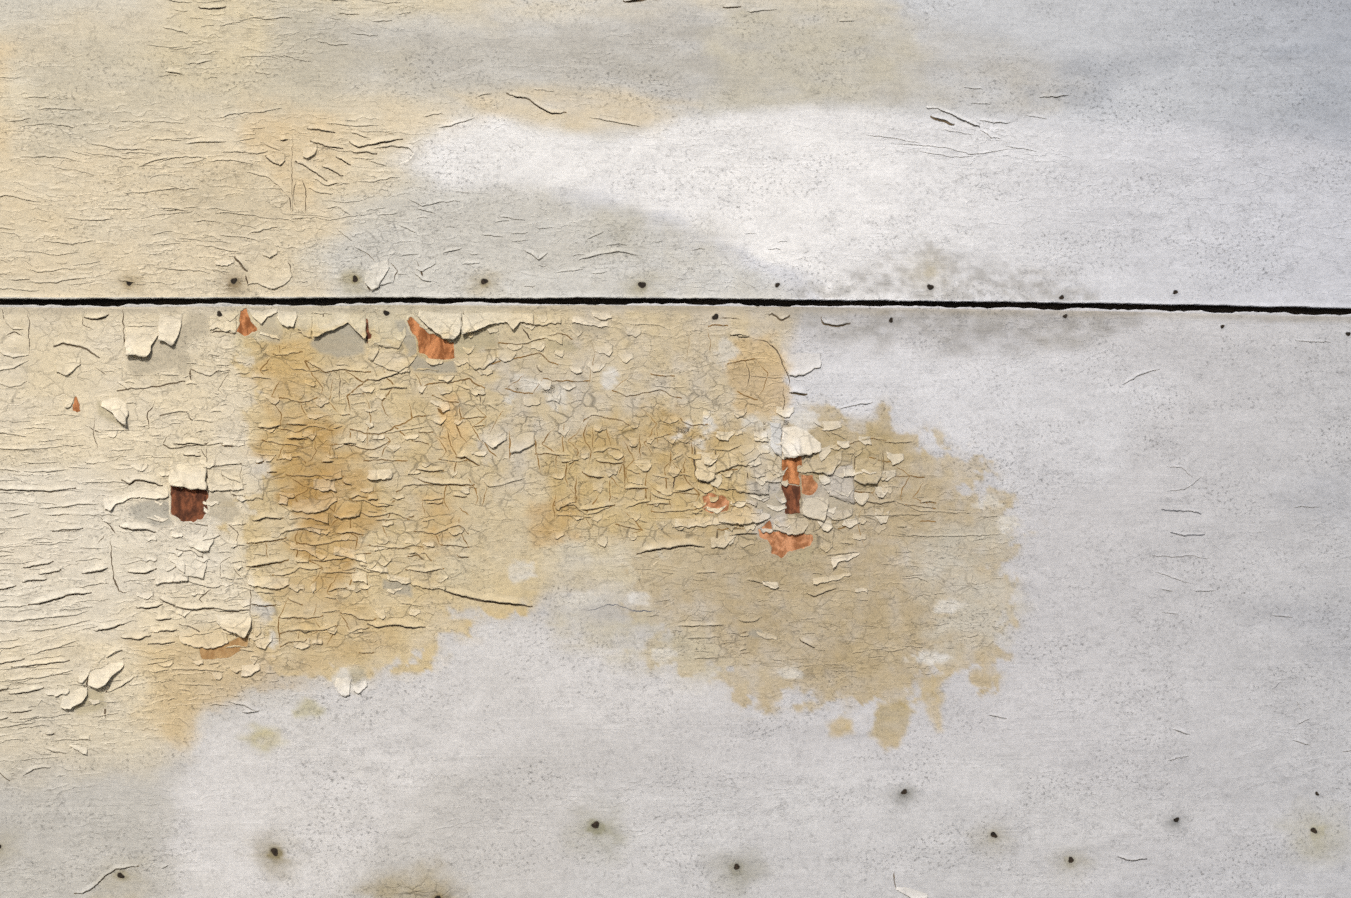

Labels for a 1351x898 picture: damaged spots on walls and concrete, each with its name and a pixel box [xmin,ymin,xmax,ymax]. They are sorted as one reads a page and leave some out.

water stain [0,0,904,297]
peeling [211,249,293,289]
peeling [337,229,480,291]
peeling [769,310,790,321]
peeling [592,316,912,597]
rust [139,314,544,766]
peeling [53,305,664,686]
water stain [0,229,1351,812]
peeling [927,596,970,617]
peeling [45,646,134,718]
peeling [325,663,373,700]
peeling [903,640,955,668]